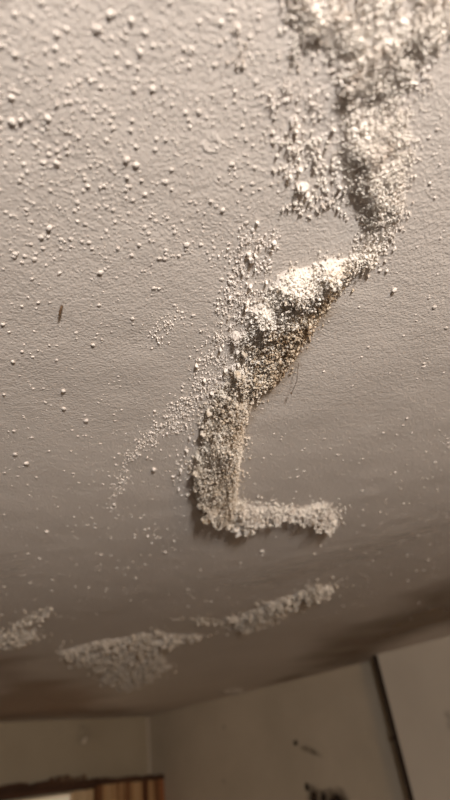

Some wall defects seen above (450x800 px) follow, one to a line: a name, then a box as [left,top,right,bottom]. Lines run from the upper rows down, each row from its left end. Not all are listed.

water stain [175,0,450,538]
water stain [0,576,353,697]